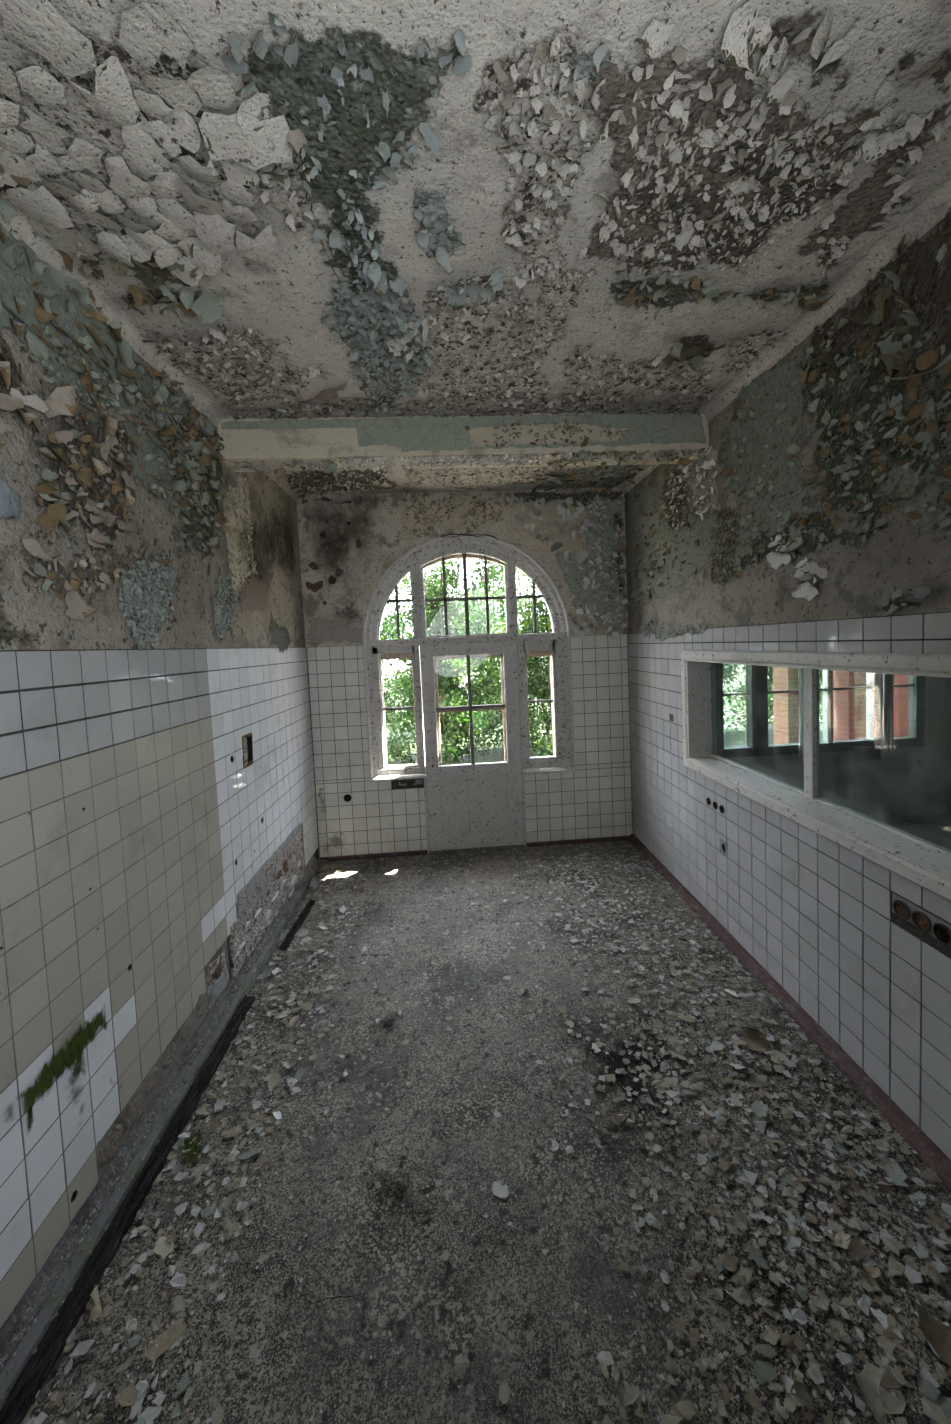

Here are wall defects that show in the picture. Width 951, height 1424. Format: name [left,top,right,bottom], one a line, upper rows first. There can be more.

peeling [0,0,951,651]
flaking render [97,823,356,1168]